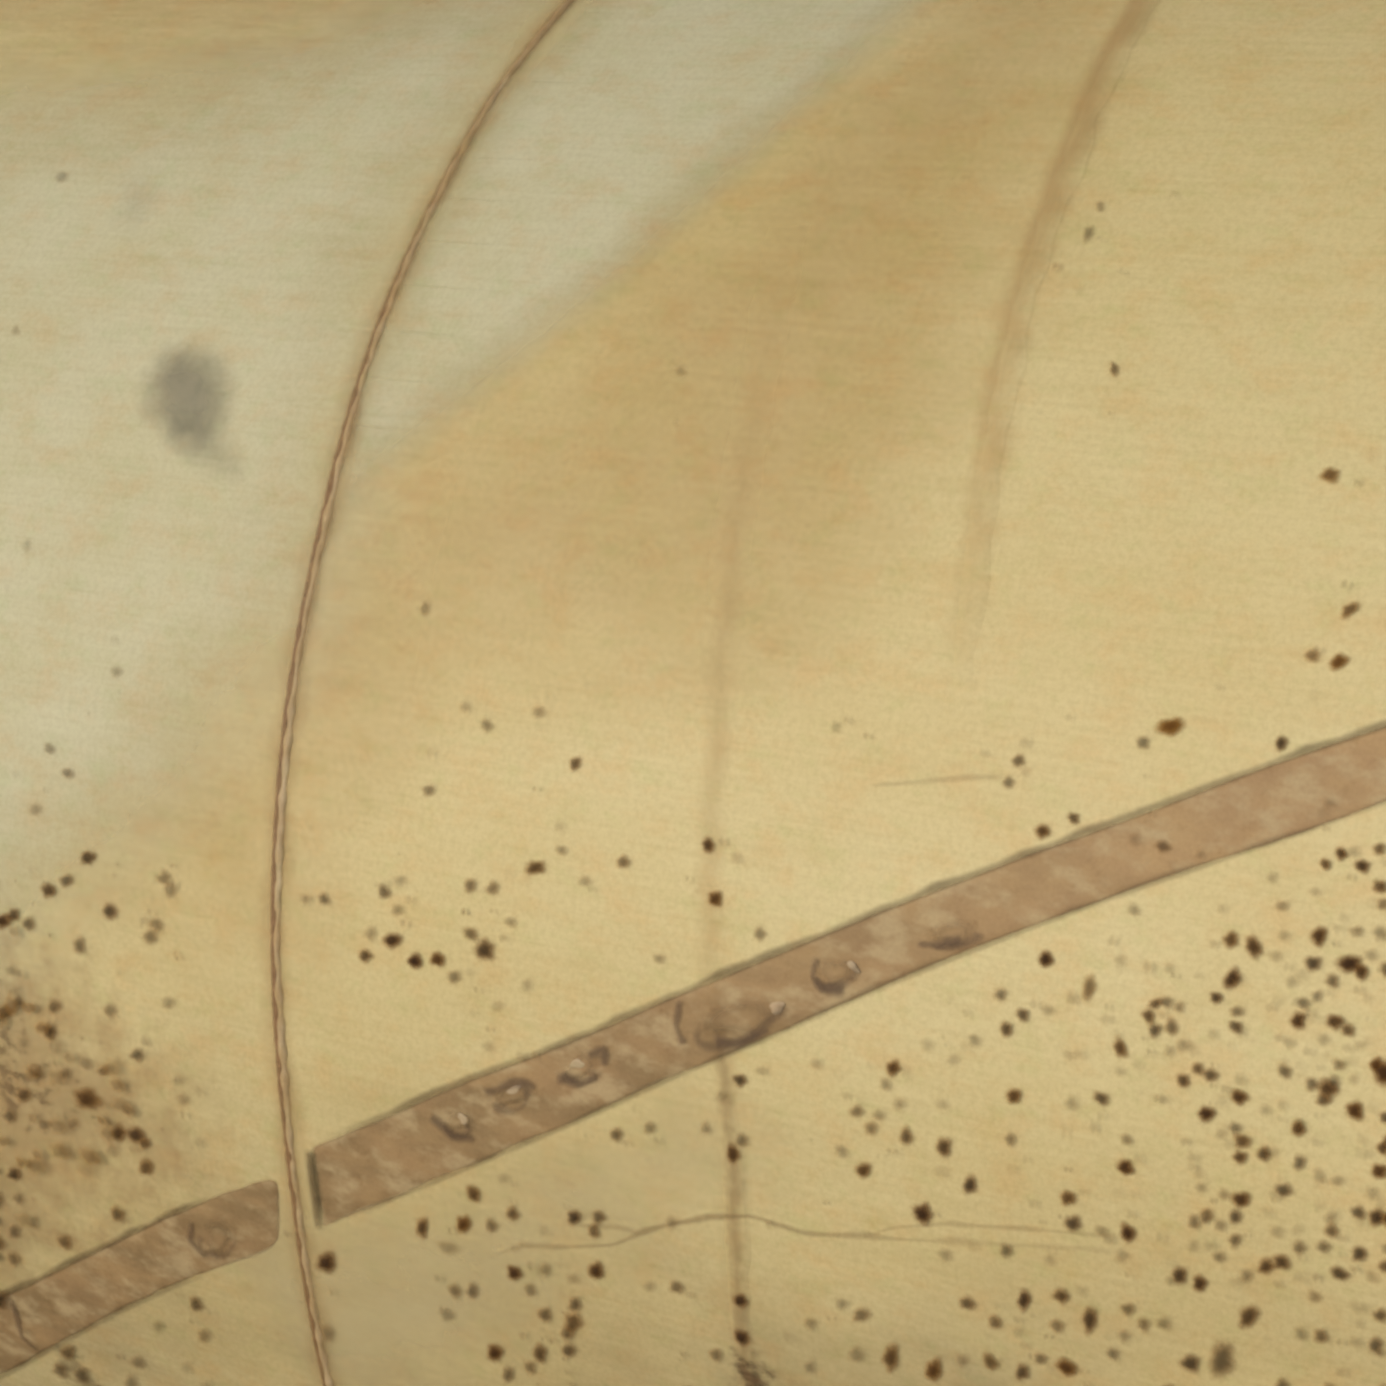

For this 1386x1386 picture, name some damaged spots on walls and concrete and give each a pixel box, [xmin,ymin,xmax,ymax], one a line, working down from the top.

rust [1158,719,1181,734]
rust [1320,844,1385,907]
rust [407,953,443,968]
rust [1039,952,1052,967]
rust [1223,932,1260,957]
rust [1306,928,1386,986]
rust [1211,969,1239,1003]
rust [1370,1058,1386,1084]
rust [1346,1103,1361,1120]
rust [76,1089,150,1173]
rust [1372,1113,1386,1178]
rust [913,1204,930,1223]